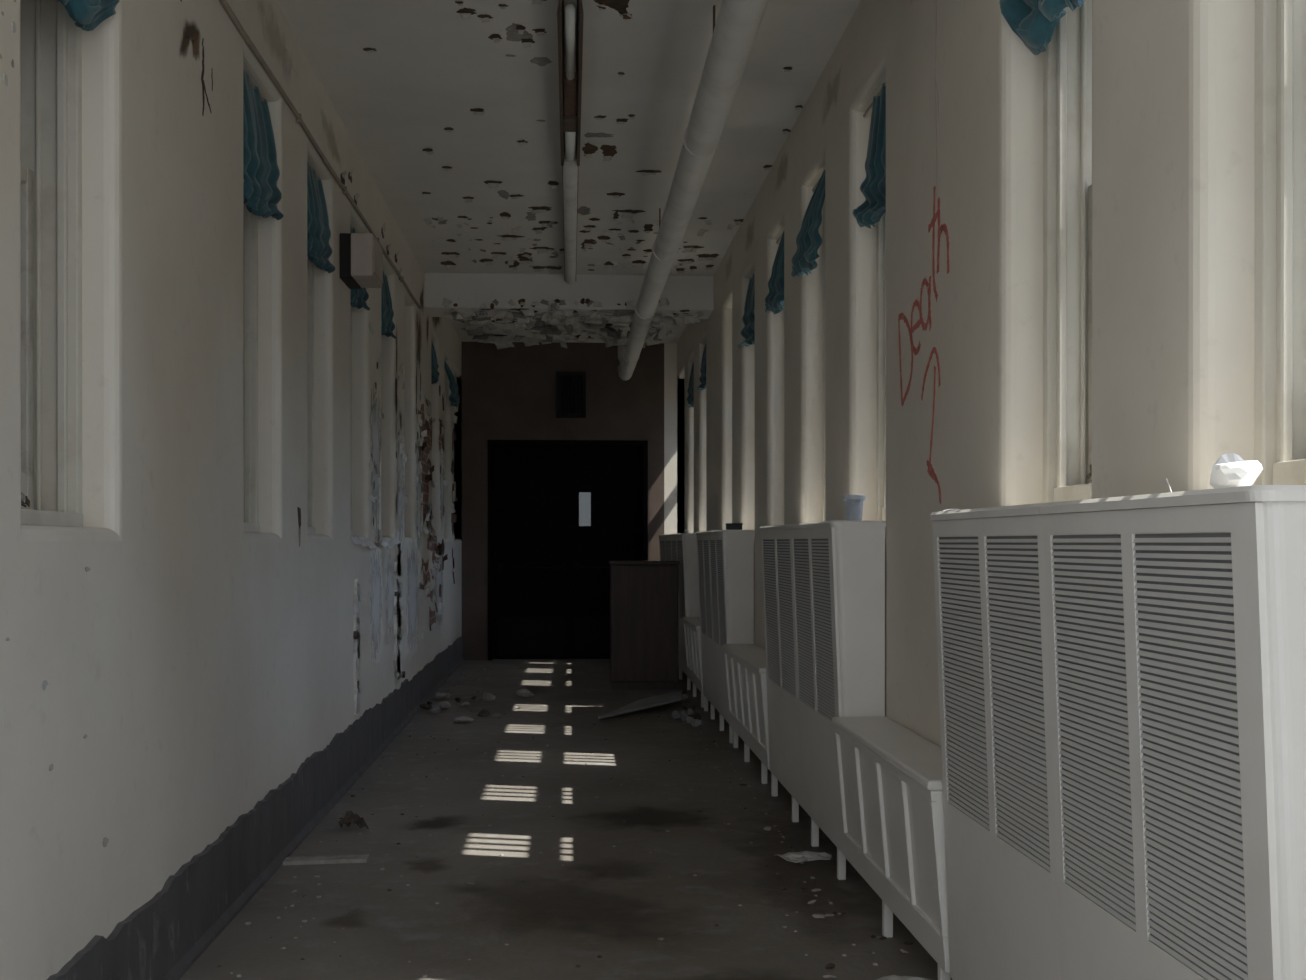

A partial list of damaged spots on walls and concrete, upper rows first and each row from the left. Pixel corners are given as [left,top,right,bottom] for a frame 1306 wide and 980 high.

peeling [455,1,553,66]
spalling [594,0,633,21]
peeling [582,114,635,161]
peeling [424,180,564,274]
peeling [578,192,659,271]
peeling [672,217,744,274]
peeling [442,297,704,349]
spalling [418,354,458,640]
peeling [375,528,405,689]